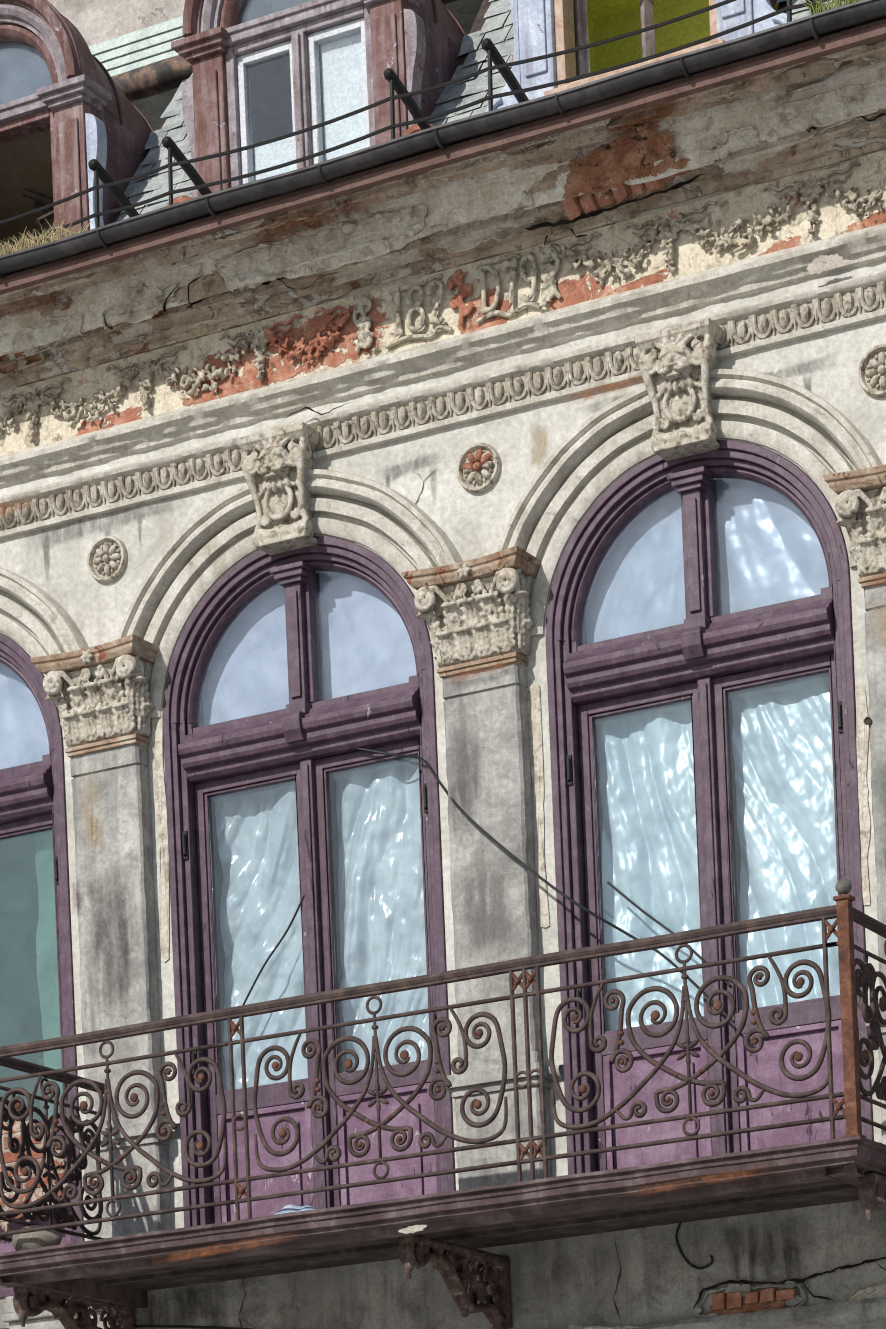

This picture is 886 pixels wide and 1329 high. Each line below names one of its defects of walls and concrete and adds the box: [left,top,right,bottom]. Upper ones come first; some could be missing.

spalling [560,76,886,221]
crack [525,173,706,247]
flaking render [837,209,886,235]
peeling [102,282,178,330]
flaking render [458,288,511,334]
peeling [0,313,84,379]
flaking render [171,297,392,406]
flaking render [75,406,142,436]
flaking render [693,1281,806,1318]
crack [693,1257,886,1309]